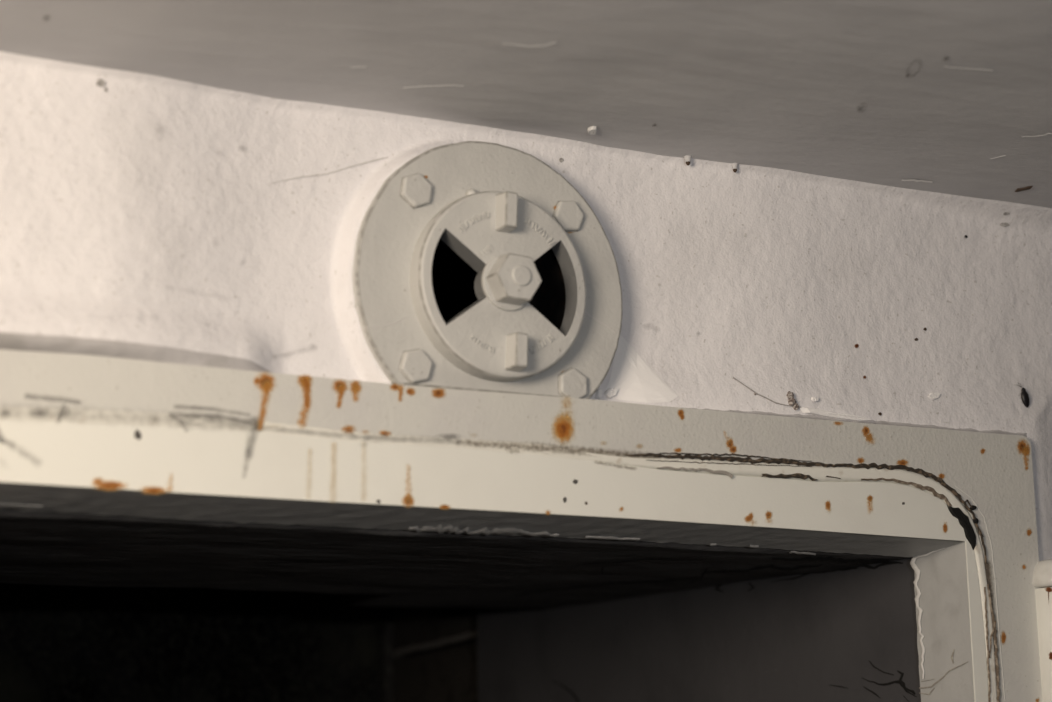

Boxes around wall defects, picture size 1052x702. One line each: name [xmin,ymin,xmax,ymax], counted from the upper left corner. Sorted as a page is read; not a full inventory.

corrosion [254,374,274,430]
corrosion [298,375,311,425]
corrosion [334,380,361,408]
corrosion [391,384,415,401]
corrosion [554,416,573,442]
corrosion [1018,440,1030,470]
corrosion [93,478,123,490]
crack [626,452,1000,702]